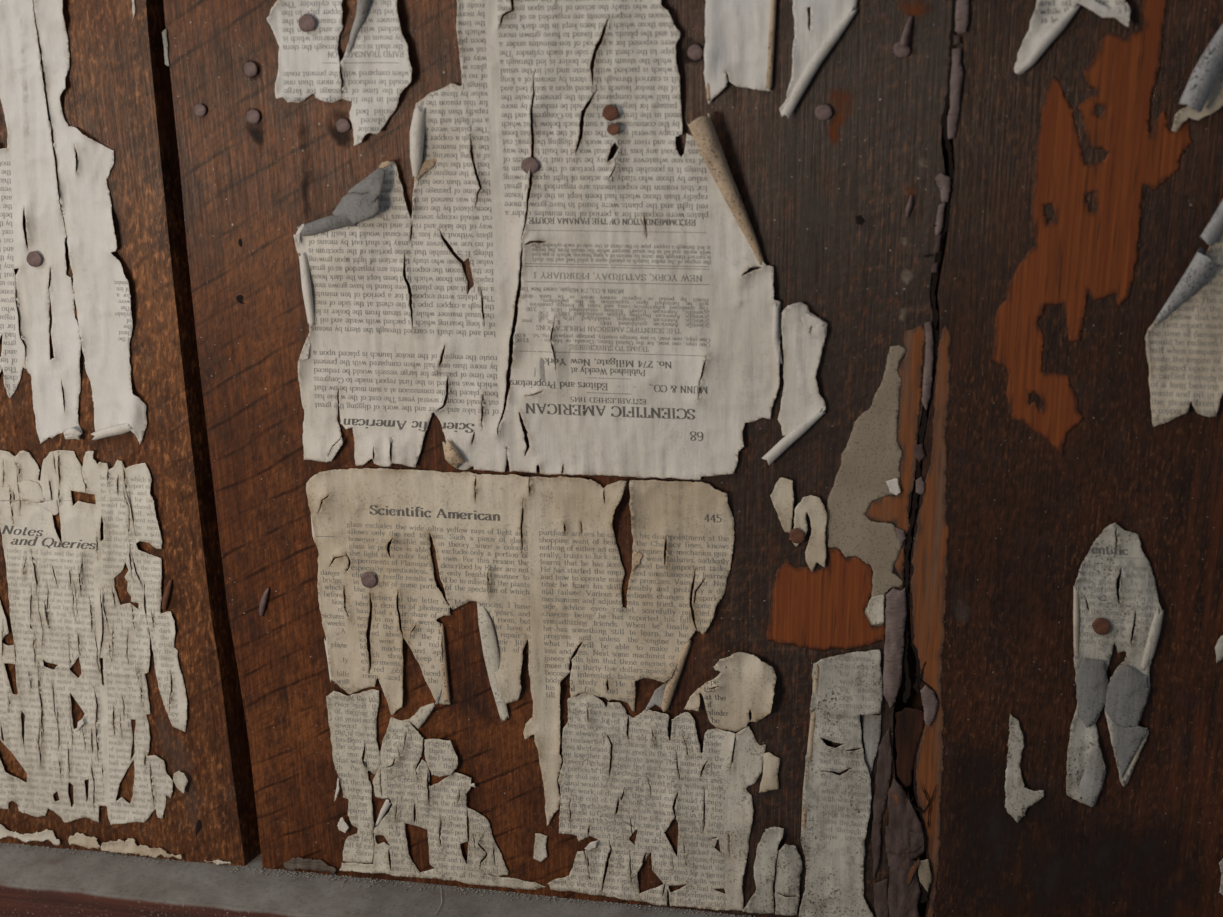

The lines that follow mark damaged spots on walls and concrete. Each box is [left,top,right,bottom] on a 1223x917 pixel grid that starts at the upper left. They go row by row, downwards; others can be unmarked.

peeling [704,0,777,104]
peeling [779,0,857,119]
peeling [992,0,1193,455]
crack [903,0,956,703]
peeling [326,309,952,917]
peeling [173,771,188,794]
crack [907,785,937,828]
crack [887,869,929,908]